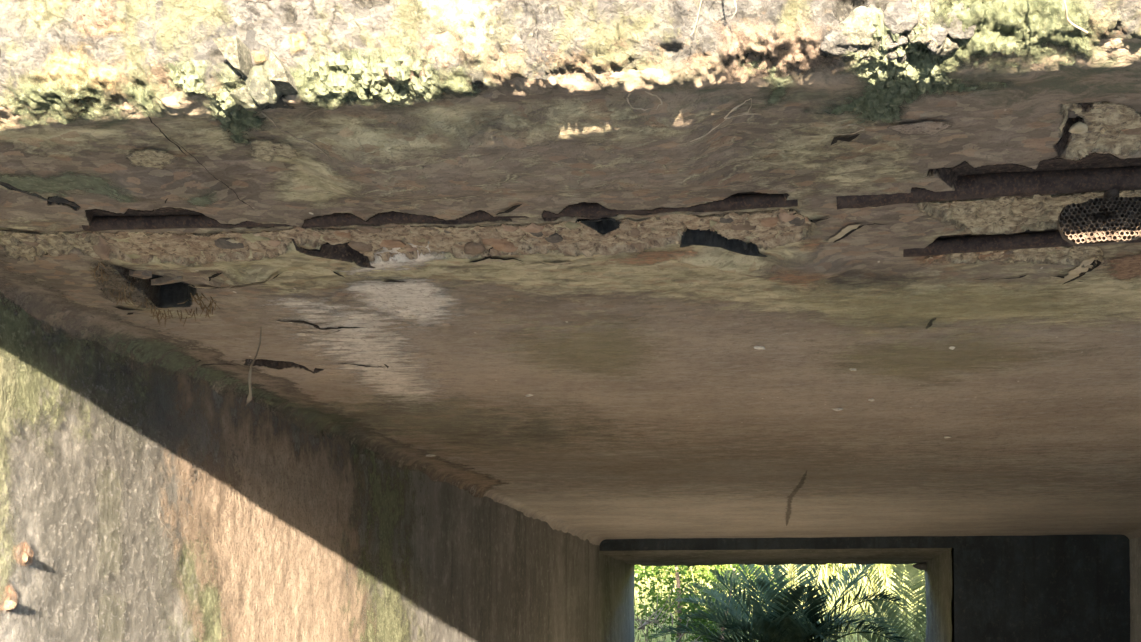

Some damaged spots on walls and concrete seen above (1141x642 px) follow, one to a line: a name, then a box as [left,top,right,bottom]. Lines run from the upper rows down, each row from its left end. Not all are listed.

peeling [887,120,952,135]
rust [836,166,1141,210]
spalling [916,102,1141,268]
rust [82,193,798,231]
spalling [0,192,813,308]
rust [903,231,1073,264]
rust [1097,237,1141,280]
crack [189,273,281,289]
crack [278,320,366,332]
damp [0,242,504,642]
crack [785,471,807,526]